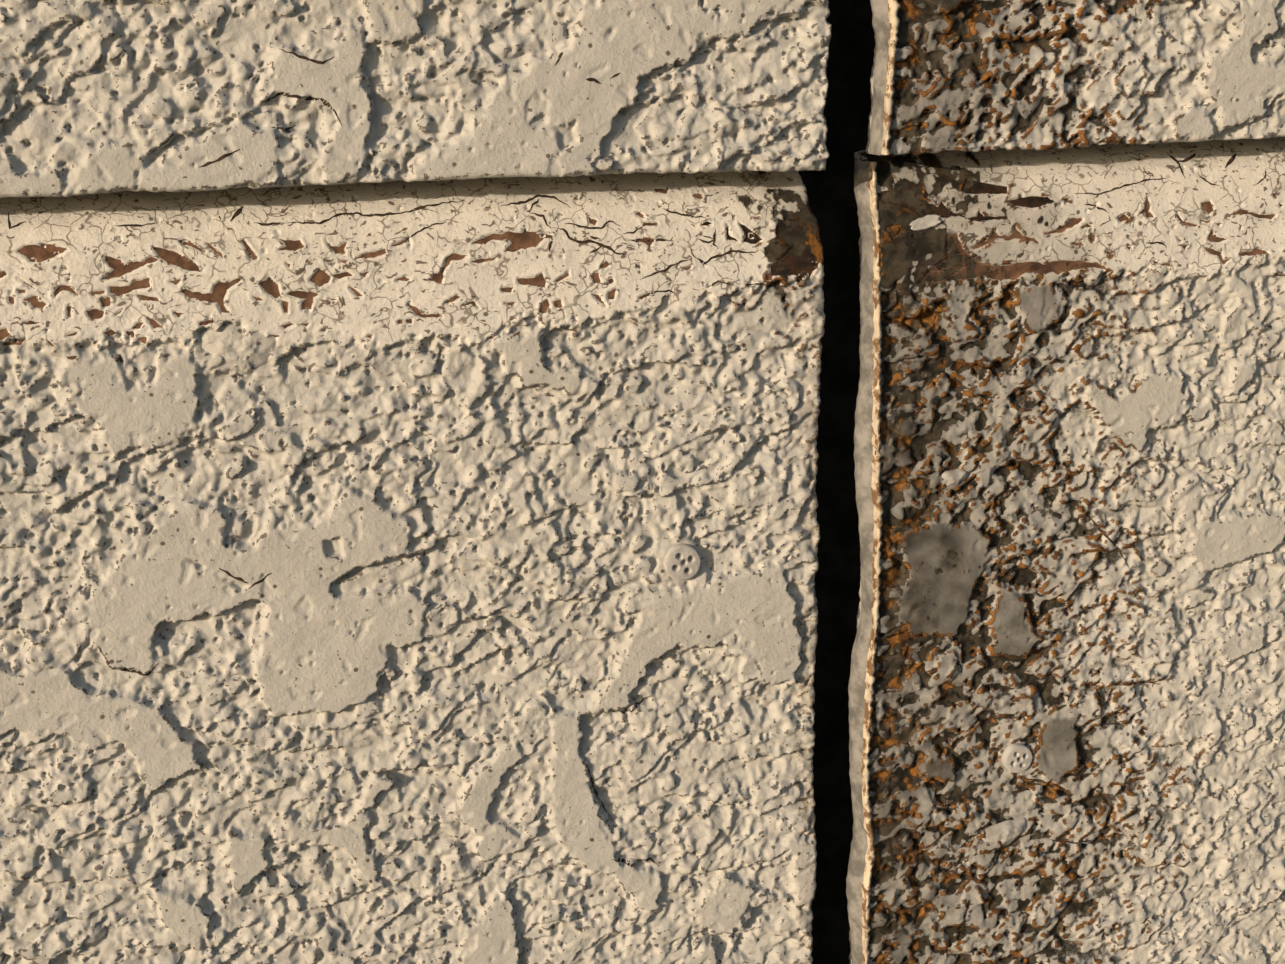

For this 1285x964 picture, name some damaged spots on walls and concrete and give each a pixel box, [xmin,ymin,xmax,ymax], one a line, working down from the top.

peeling [0,239,240,346]
peeling [254,237,409,337]
peeling [397,295,478,324]
peeling [430,229,551,283]
peeling [501,273,569,337]
peeling [591,262,616,307]
peeling [701,216,821,283]
rust [730,171,824,347]
peeling [877,180,1131,284]
peeling [1176,201,1268,265]
peeling [1234,195,1282,219]
rust [860,0,1220,964]